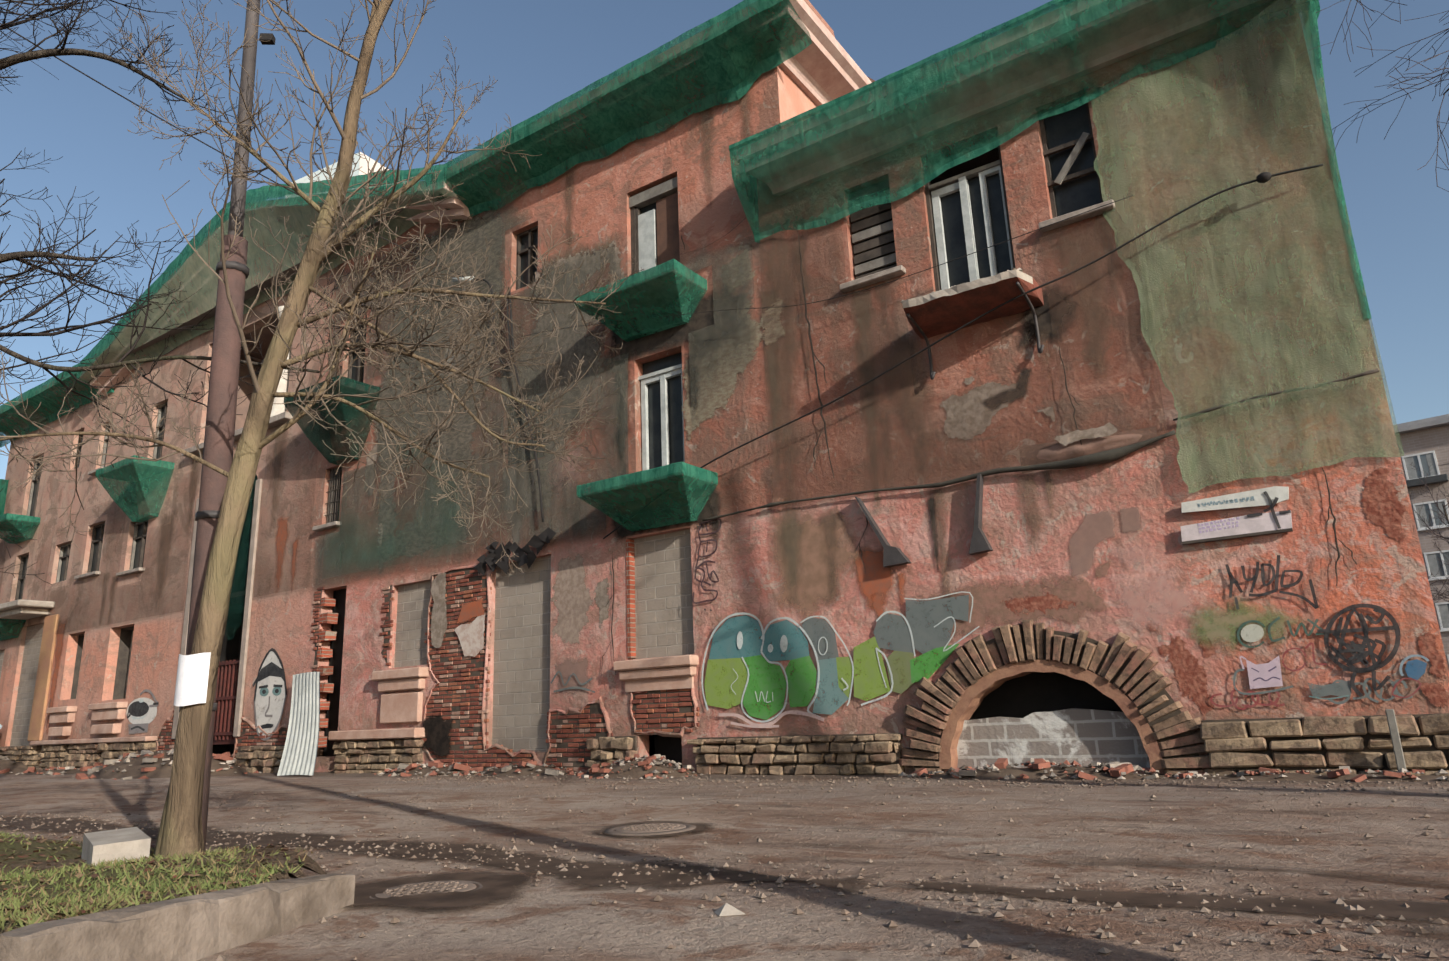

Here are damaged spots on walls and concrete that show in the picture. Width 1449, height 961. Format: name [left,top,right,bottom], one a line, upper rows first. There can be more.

damp [685,352,698,408]
flaking render [940,367,1031,440]
crack [1322,468,1357,586]
spalling [1360,467,1406,543]
corrosion [854,549,905,618]
flaking render [379,585,395,665]
flaking render [420,553,613,773]
spalling [1143,620,1216,718]
spalling [1418,632,1449,708]
flaking render [629,688,700,737]